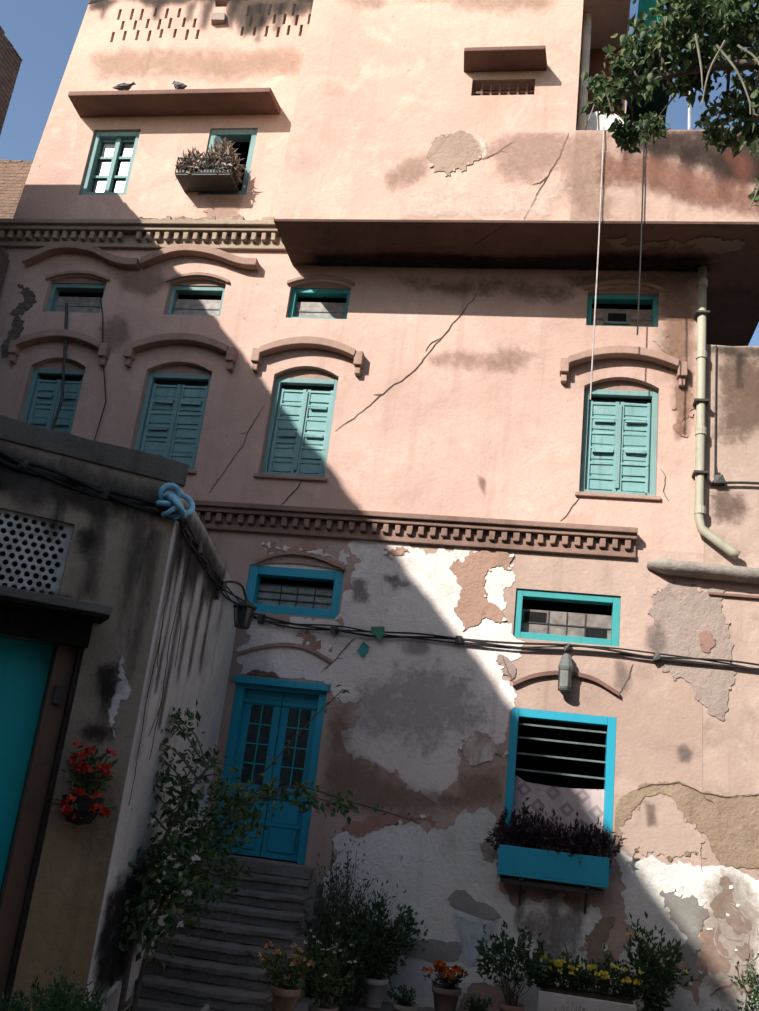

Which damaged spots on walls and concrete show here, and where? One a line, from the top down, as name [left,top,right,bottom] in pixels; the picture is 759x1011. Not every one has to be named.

water stain [142,0,212,26]
water stain [226,0,313,33]
flaking render [427,130,484,177]
crack [524,133,569,218]
water stain [403,129,759,216]
crack [337,281,485,430]
water stain [713,346,759,434]
crack [209,406,265,493]
water stain [150,503,226,726]
peeling [449,549,514,631]
flaking render [647,579,736,721]
flaking render [614,781,759,992]